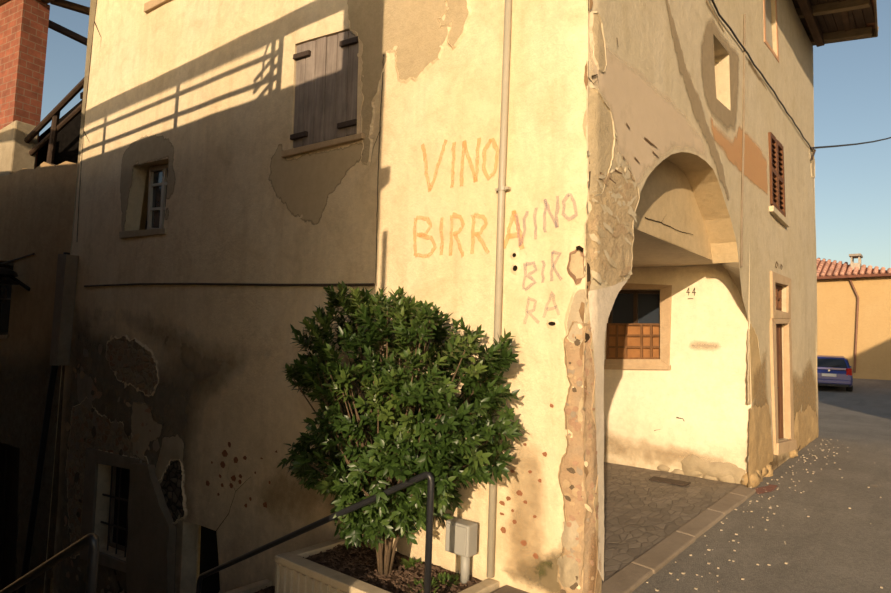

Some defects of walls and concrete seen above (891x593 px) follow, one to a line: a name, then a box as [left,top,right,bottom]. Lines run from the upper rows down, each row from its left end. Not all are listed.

peeling [268,0,472,224]
peeling [546,0,640,593]
flaking render [105,335,159,397]
damp [754,360,767,408]
damp [793,365,816,419]
damp [0,326,234,593]
spalling [158,458,187,525]